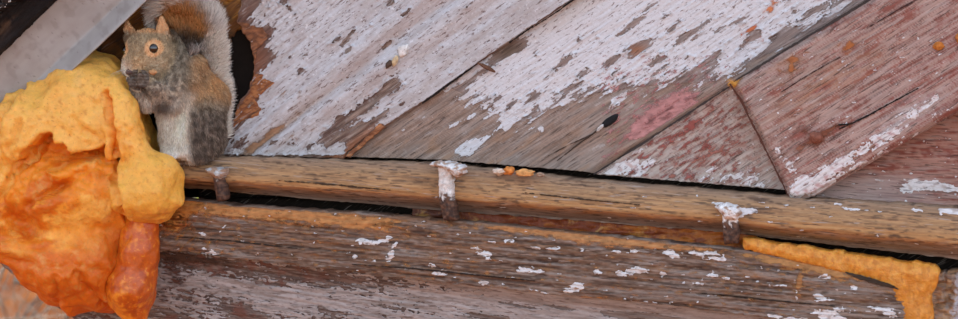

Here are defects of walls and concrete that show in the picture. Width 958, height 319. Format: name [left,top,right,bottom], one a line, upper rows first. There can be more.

peeling [237,0,292,111]
peeling [332,21,363,54]
peeling [615,1,658,37]
peeling [664,15,747,46]
peeling [733,0,865,71]
peeling [256,71,405,157]
peeling [444,36,721,158]
peeling [604,141,668,177]
peeling [467,231,527,261]
peeling [148,218,461,319]
peeling [502,266,545,285]
peeling [456,289,575,319]